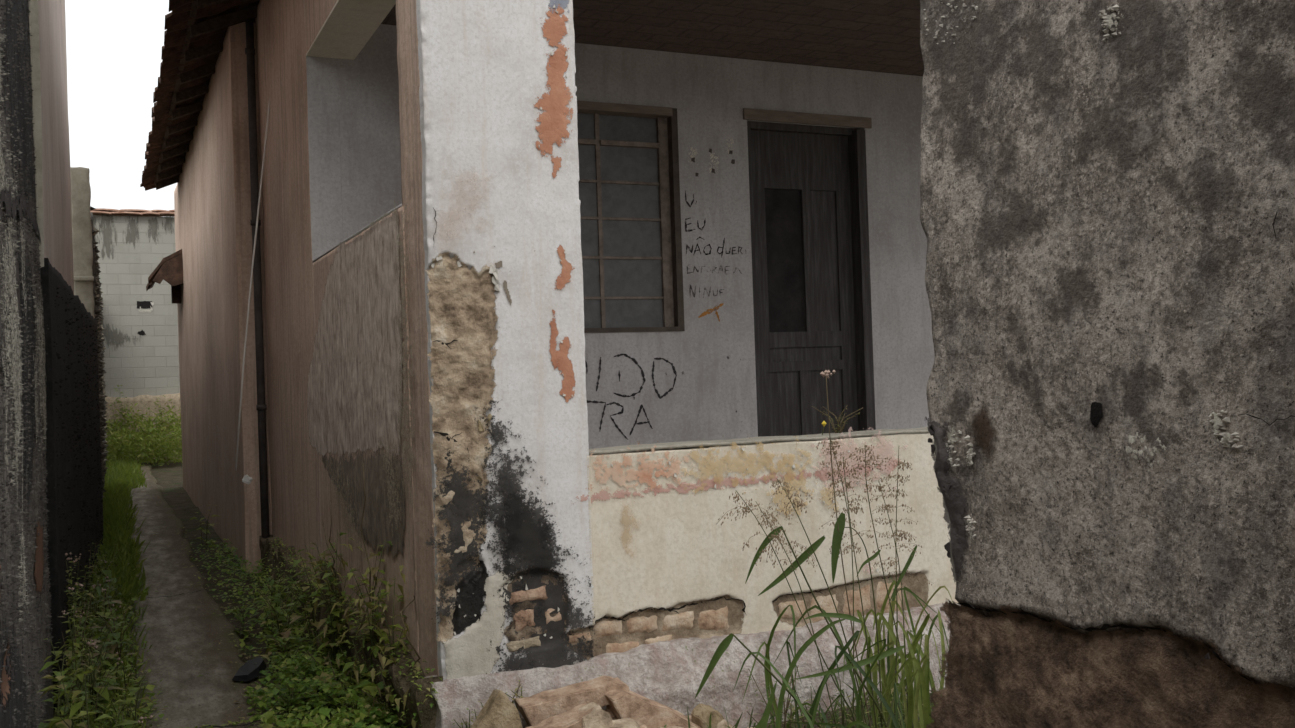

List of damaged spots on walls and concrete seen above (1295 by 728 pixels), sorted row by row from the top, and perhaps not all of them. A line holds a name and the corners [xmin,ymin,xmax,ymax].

peeling [534,0,574,178]
flaking render [424,246,512,644]
water stain [452,478,575,636]
peeling [549,309,576,402]
flaking render [504,570,744,661]
flaking render [925,417,977,583]
spalling [772,563,1295,728]
flaking render [1126,432,1171,472]
flaking render [1209,410,1243,451]